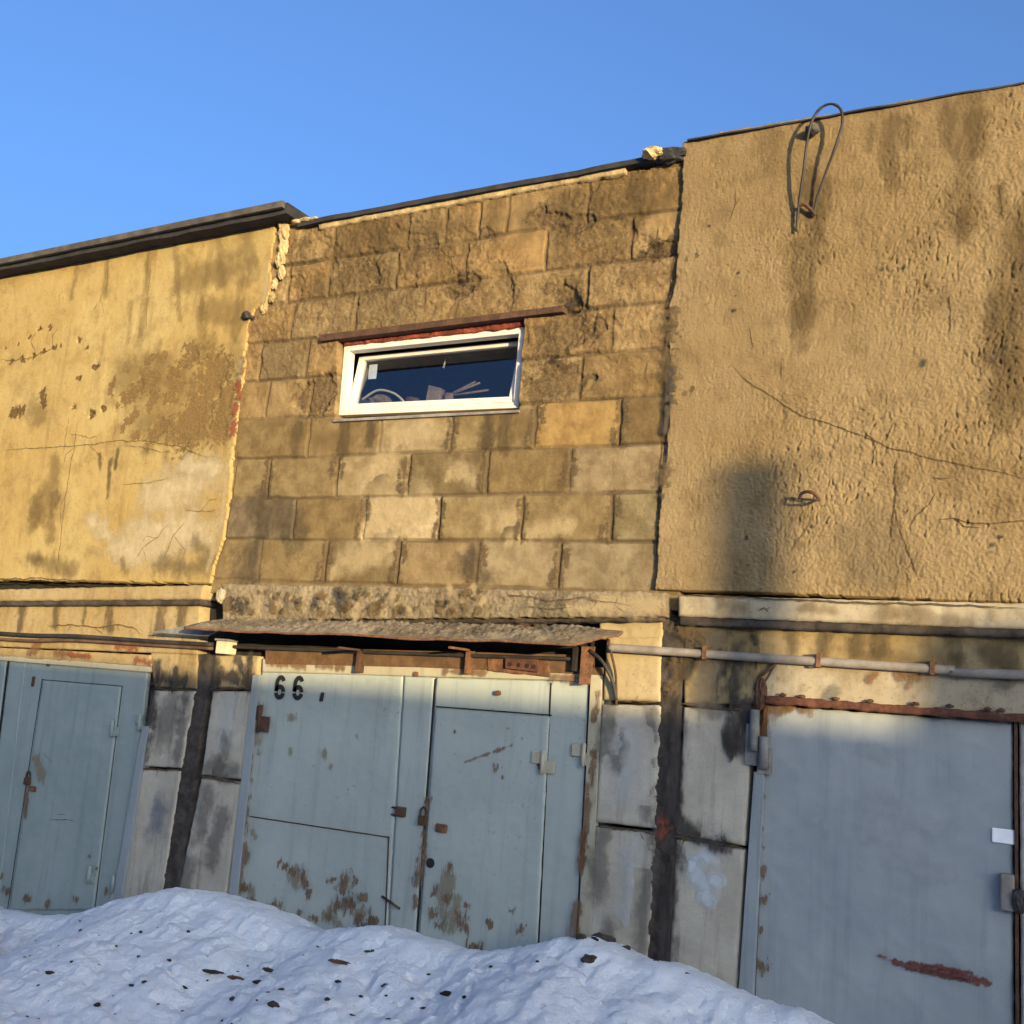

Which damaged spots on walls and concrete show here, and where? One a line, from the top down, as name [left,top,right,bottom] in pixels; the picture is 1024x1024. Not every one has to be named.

spalling [5,324,62,365]
peeling [90,339,247,460]
crack [0,419,239,586]
crack [730,359,1024,575]
rust [277,857,379,927]
rust [411,826,484,950]
damp [656,702,732,962]